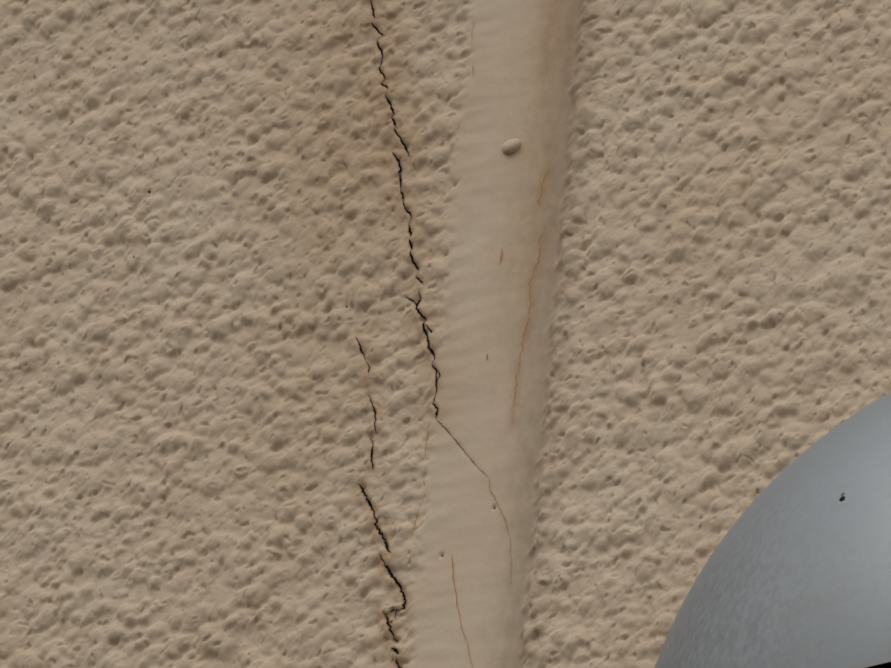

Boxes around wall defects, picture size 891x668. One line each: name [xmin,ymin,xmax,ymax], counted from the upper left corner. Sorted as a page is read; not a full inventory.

crack [370,0,495,498]
crack [355,336,406,668]
crack [451,556,468,644]